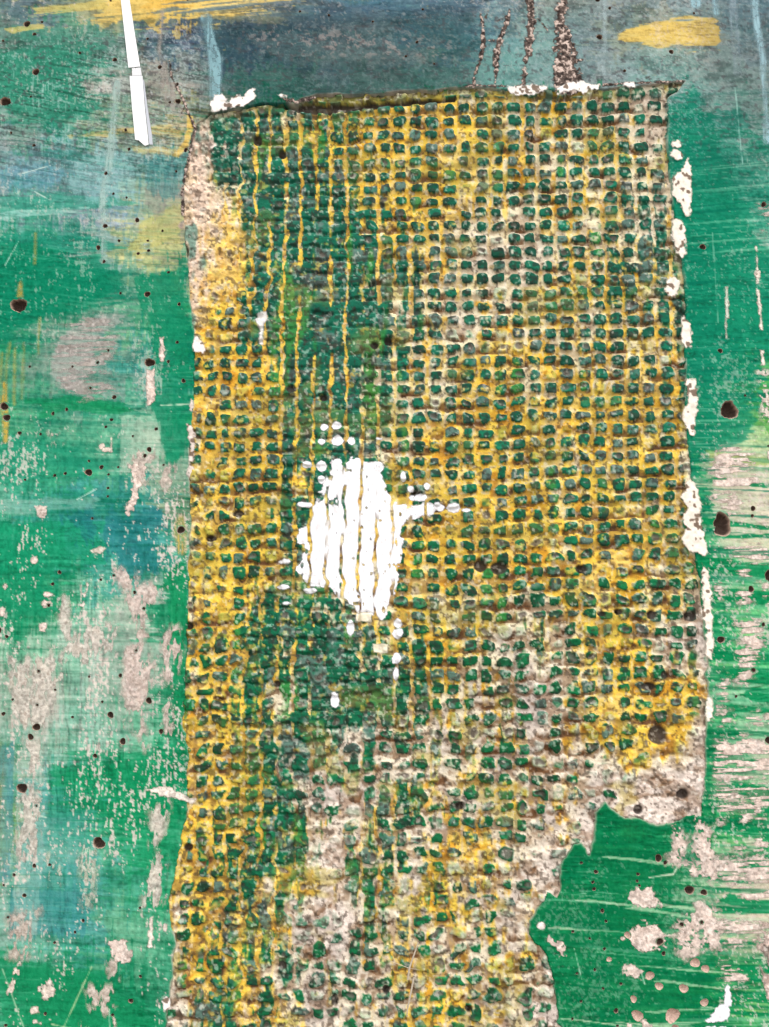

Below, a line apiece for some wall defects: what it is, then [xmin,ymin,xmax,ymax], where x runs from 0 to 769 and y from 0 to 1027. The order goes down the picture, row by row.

peeling [56,318,116,399]
peeling [34,505,47,518]
spalling [114,81,769,1027]
peeling [8,583,117,875]
peeling [81,845,96,906]
peeling [30,980,55,1024]
peeling [88,939,133,1027]